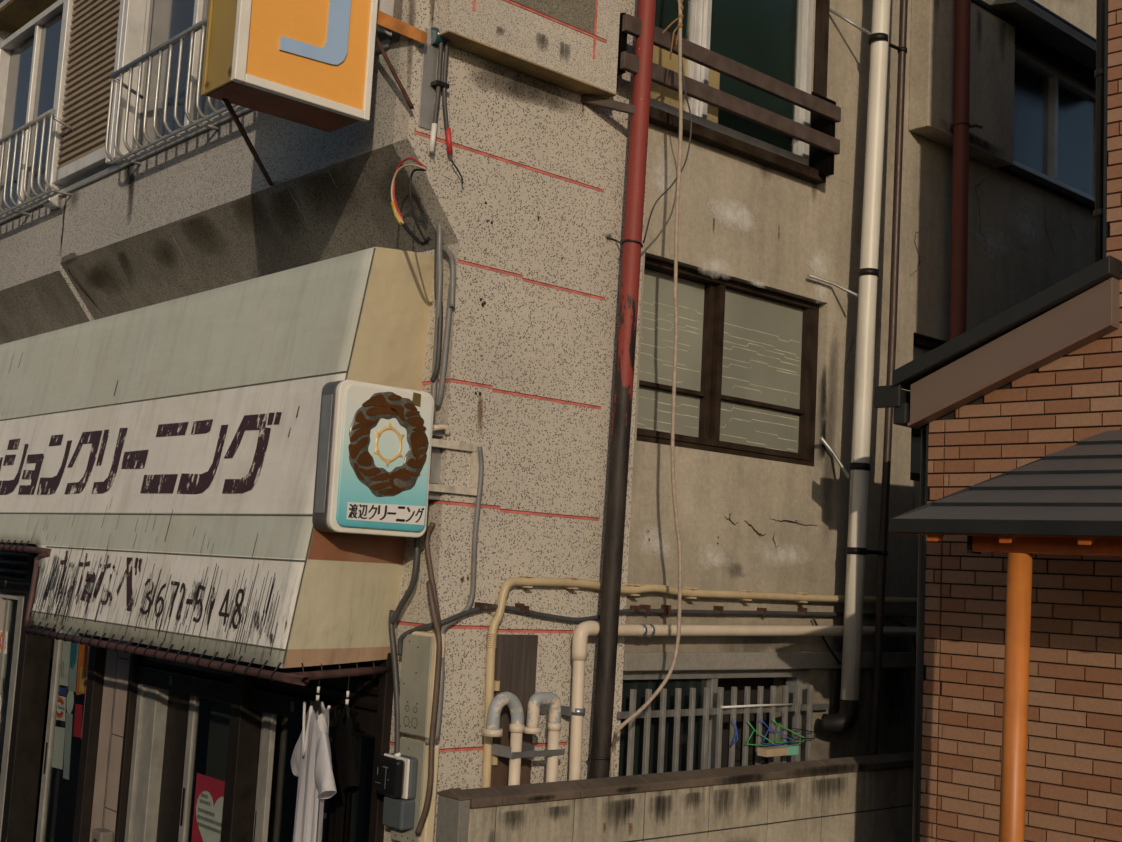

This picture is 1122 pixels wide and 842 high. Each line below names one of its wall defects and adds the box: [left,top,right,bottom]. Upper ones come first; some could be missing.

damp [125,165,133,201]
crack [725,514,818,547]
damp [657,797,670,816]
damp [716,774,761,806]
damp [783,764,862,799]